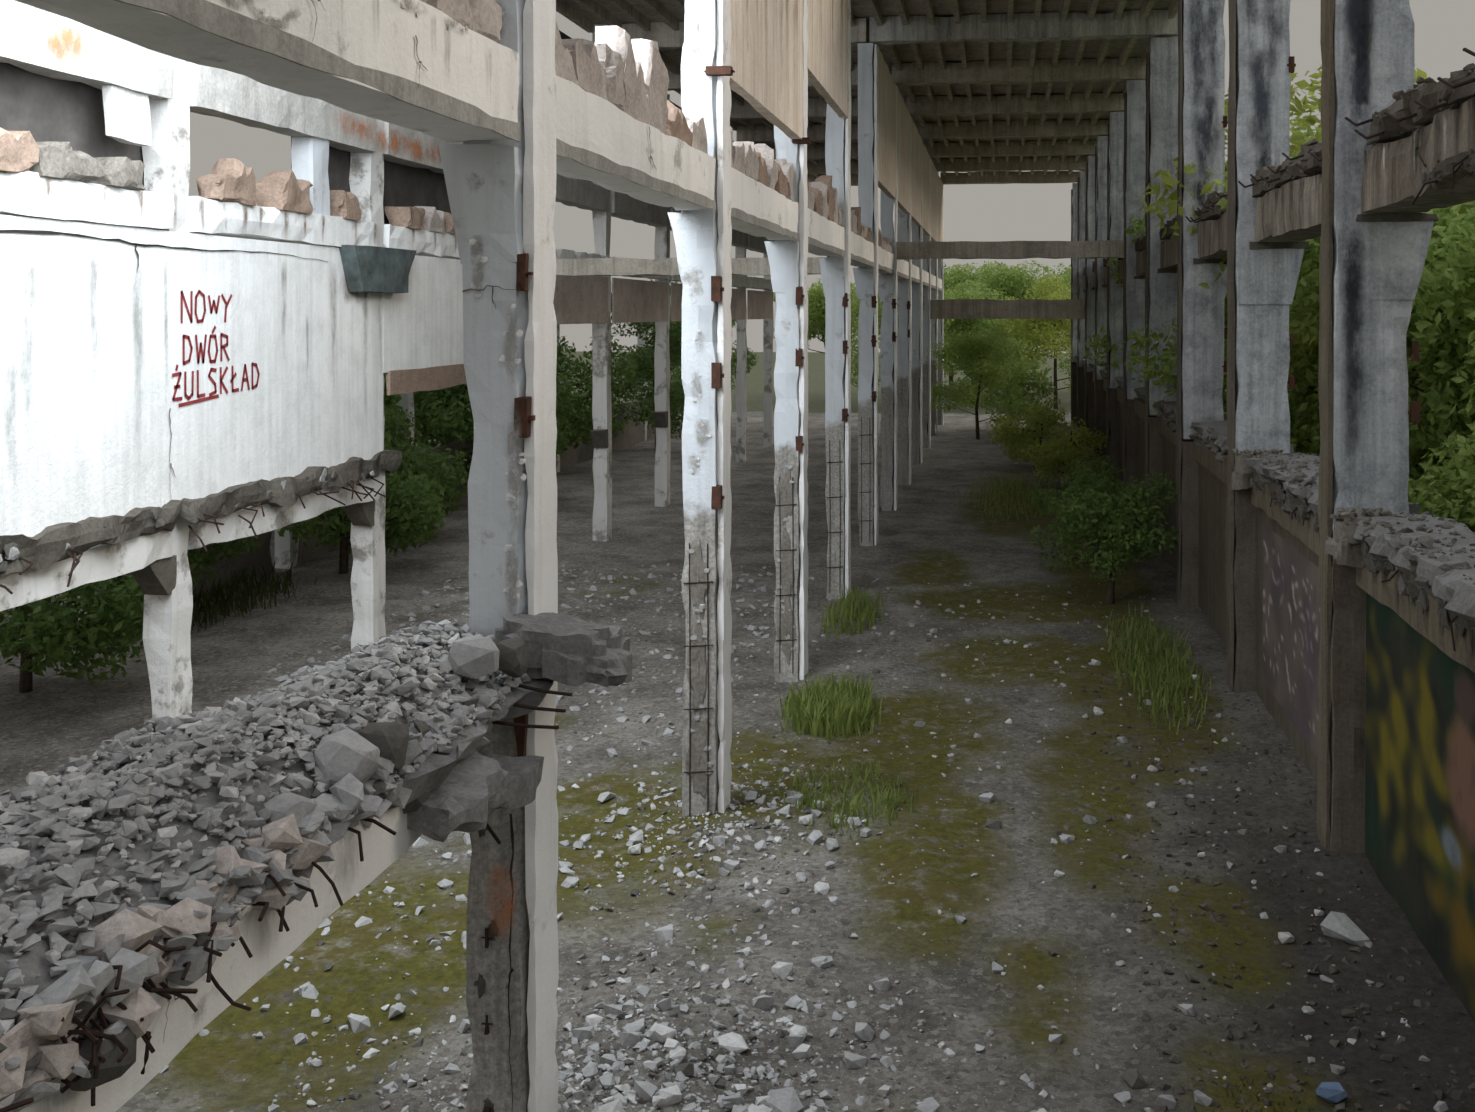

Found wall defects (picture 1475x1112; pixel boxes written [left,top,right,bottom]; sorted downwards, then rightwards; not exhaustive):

water stain [1253,26,1277,168]
water stain [1347,0,1373,115]
spalling [1345,48,1475,140]
water stain [1345,245,1362,438]
spalling [1360,511,1475,651]
spalling [0,684,572,1112]